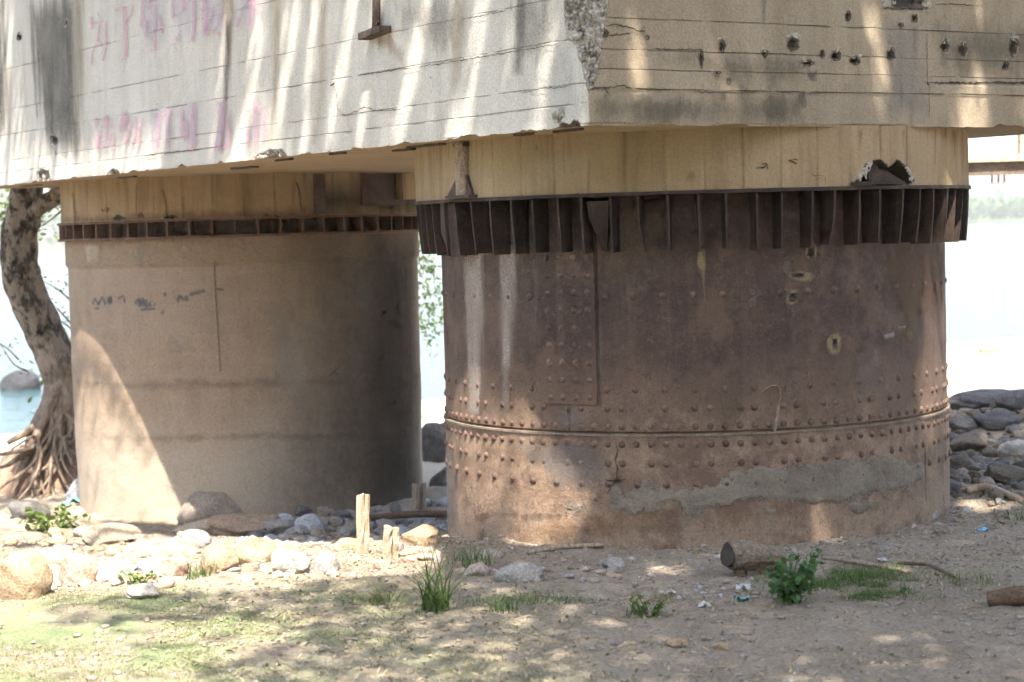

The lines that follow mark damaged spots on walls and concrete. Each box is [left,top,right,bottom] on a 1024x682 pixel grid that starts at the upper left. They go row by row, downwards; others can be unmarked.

spalling [564,0,609,93]
spalling [785,33,862,67]
spalling [886,44,898,61]
spalling [940,37,968,57]
spalling [1002,31,1020,70]
water stain [31,0,80,153]
spalling [851,159,915,186]
corrosion [827,334,841,354]
crack [606,443,625,494]